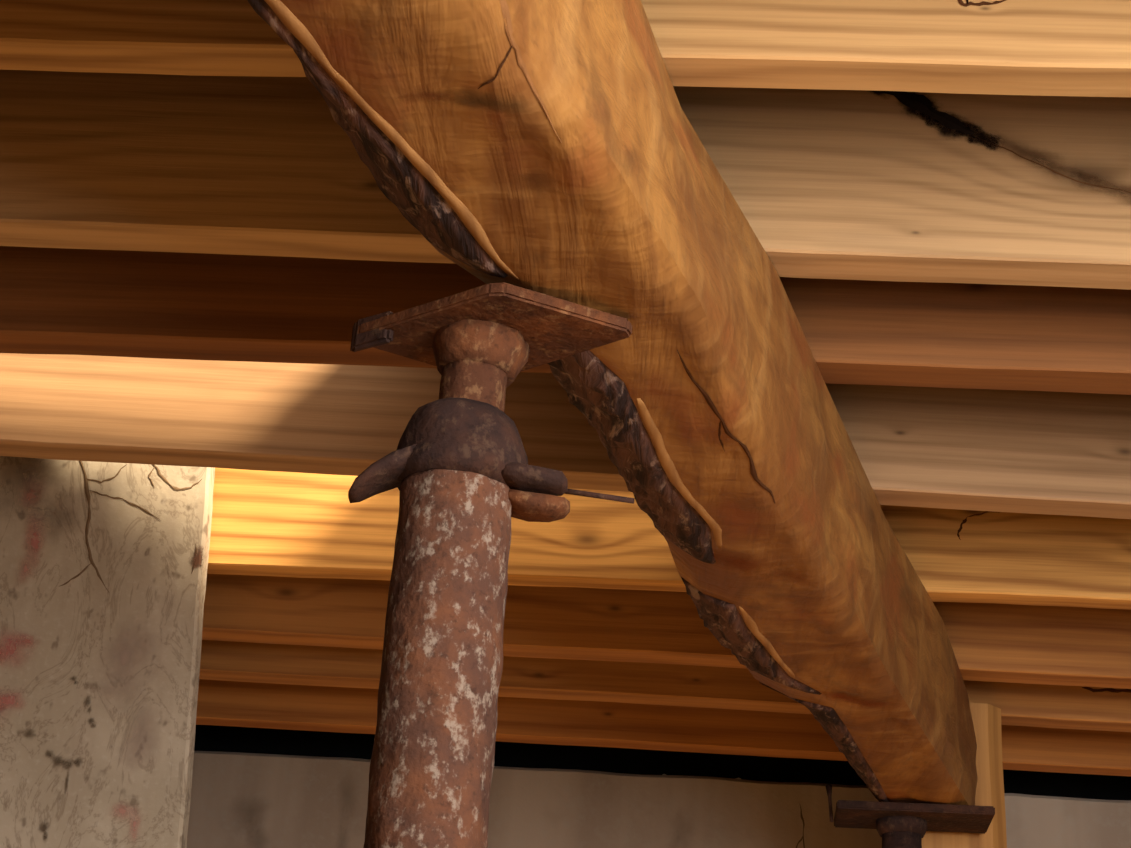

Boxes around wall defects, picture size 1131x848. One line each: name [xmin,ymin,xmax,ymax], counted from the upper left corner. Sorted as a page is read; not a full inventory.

crack [869,90,1131,196]
crack [677,350,775,503]
crack [60,461,202,592]